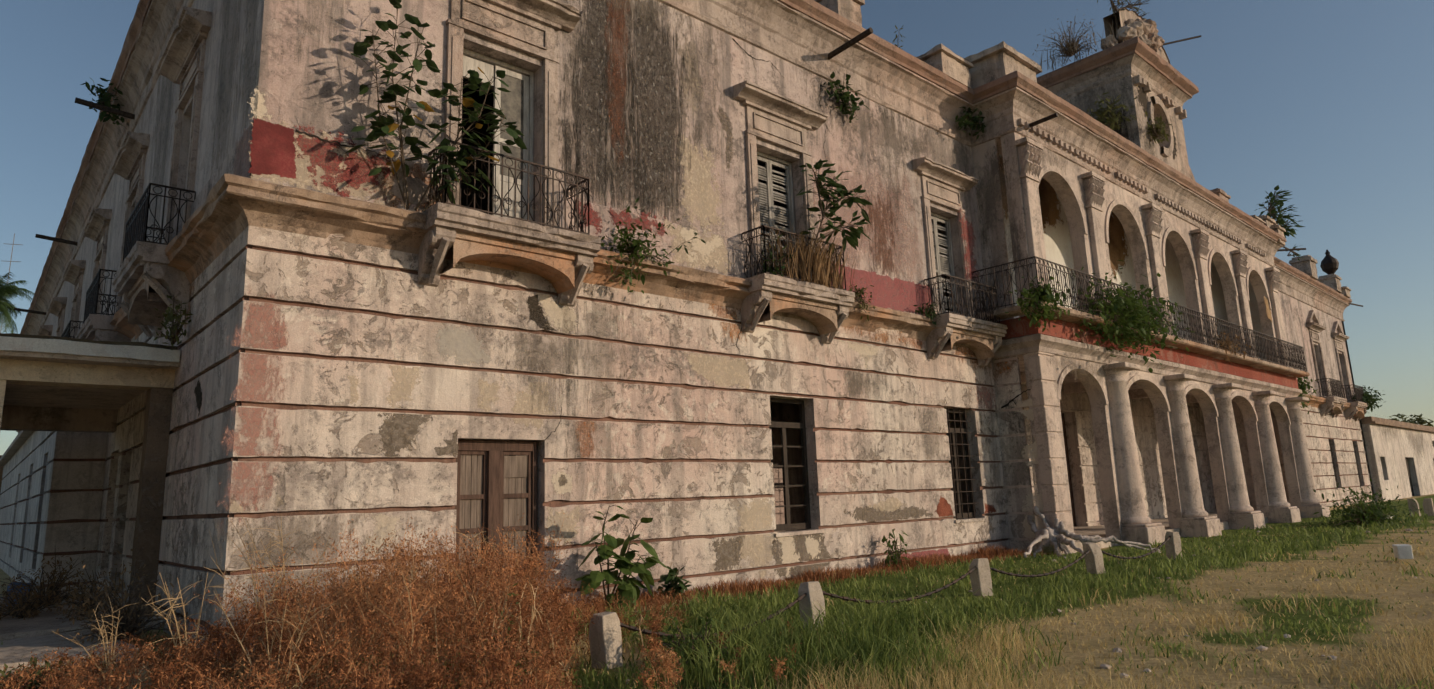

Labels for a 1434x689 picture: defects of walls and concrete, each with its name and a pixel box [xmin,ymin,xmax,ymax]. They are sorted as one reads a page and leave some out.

peeling [234,59,402,207]
leakage [554,0,718,221]
flaking render [526,294,580,333]
flaking render [371,357,433,457]
flaking render [434,431,459,457]
flaking render [709,498,831,580]
flaking render [844,495,954,522]